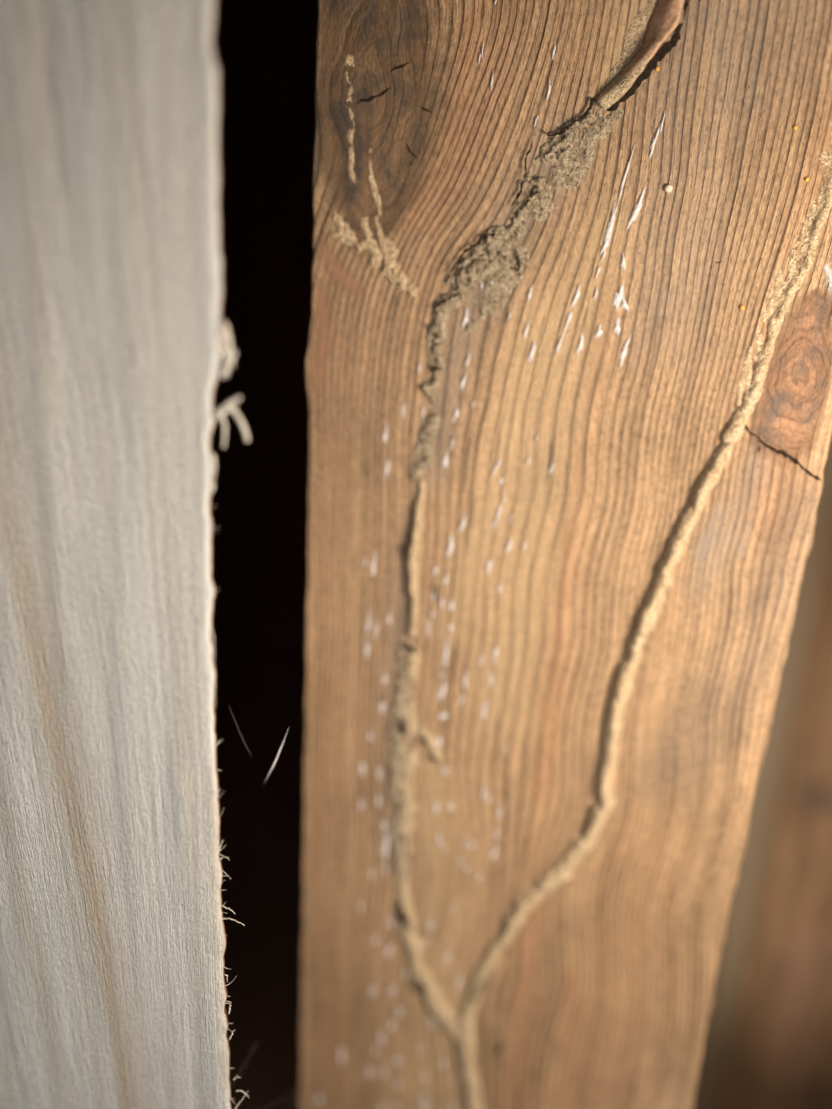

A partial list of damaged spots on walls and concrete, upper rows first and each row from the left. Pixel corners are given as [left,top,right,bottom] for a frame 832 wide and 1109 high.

crack [510,98,598,208]
crack [433,234,520,309]
crack [745,425,822,481]